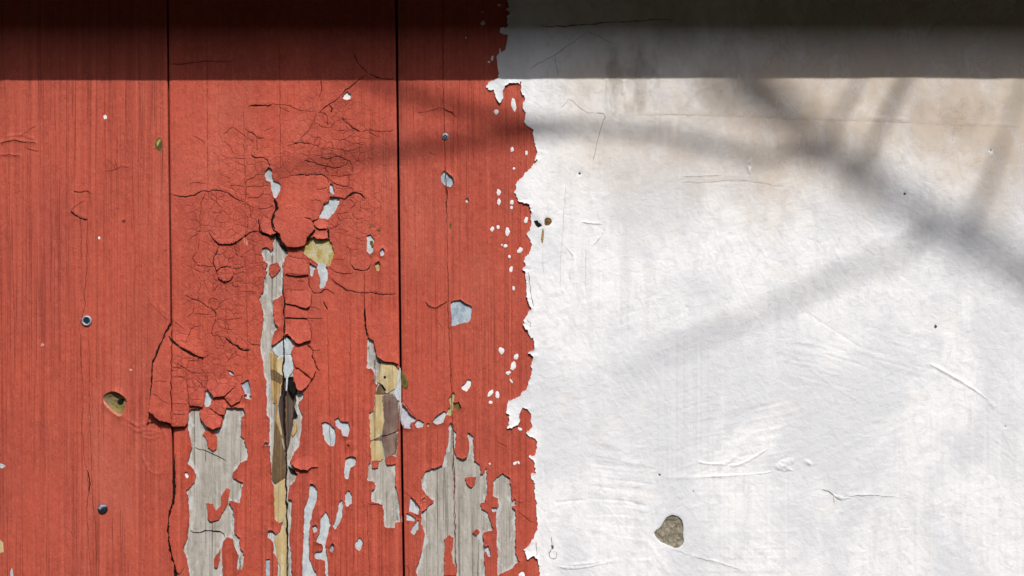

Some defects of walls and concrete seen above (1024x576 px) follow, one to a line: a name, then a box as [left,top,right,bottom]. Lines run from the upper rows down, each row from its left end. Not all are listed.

peeling [169,370,251,576]
crack [147,33,393,576]
peeling [207,167,520,576]
spalling [534,218,552,243]
spalling [654,515,684,548]